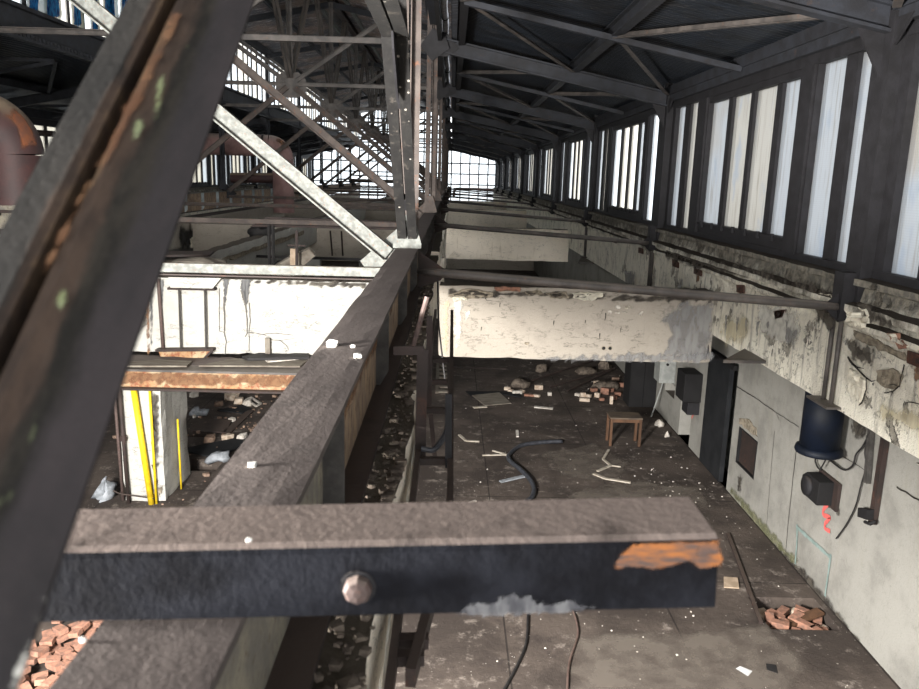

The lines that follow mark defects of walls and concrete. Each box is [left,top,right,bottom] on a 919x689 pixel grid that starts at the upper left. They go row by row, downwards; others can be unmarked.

corrosion [162,13,181,41]
corrosion [8,109,36,146]
corrosion [101,54,160,165]
corrosion [47,222,69,264]
flaking render [844,307,908,361]
corrosion [124,372,295,387]
peeling [847,368,904,403]